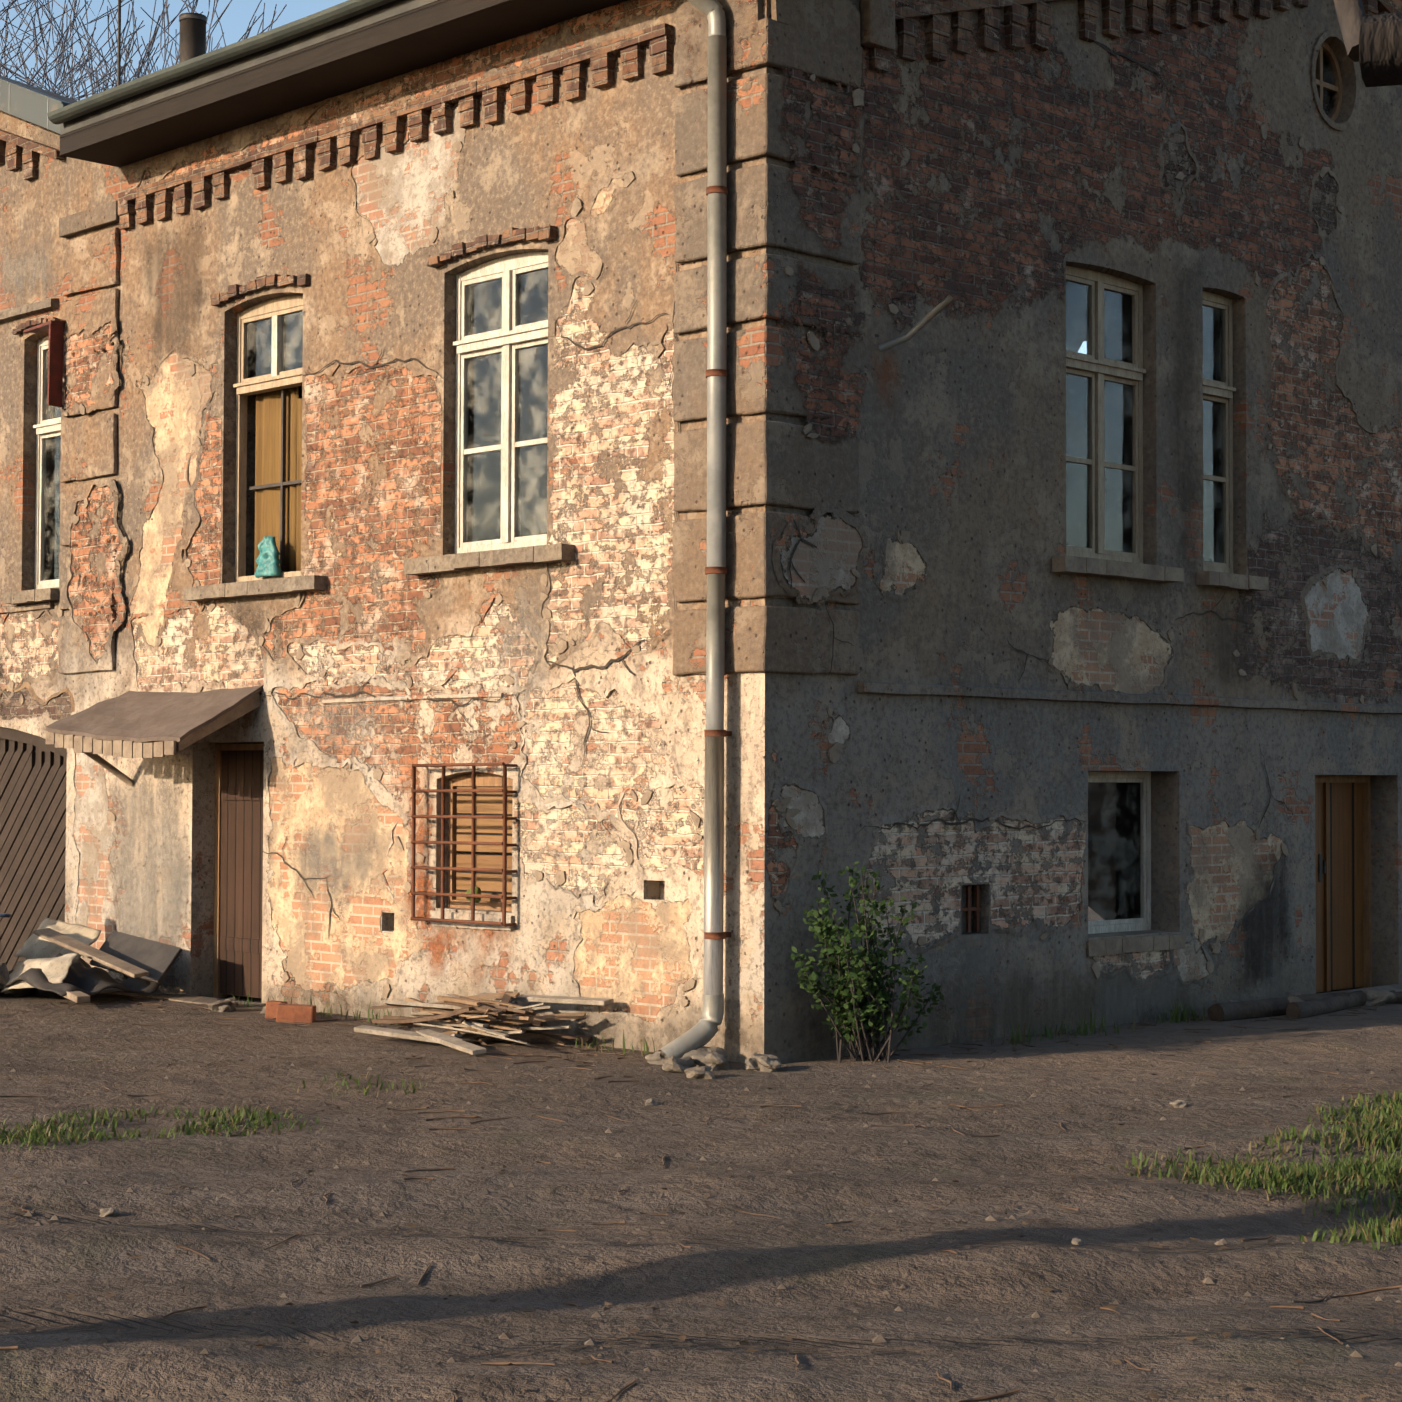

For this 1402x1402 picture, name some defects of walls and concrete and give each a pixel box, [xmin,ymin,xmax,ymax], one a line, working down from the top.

flaking render [772,0,1402,706]
flaking render [0,171,704,1031]
crack [546,639,645,766]
flaking render [816,704,852,764]
flaking render [767,750,828,915]
flaking render [852,803,1087,955]
flaking render [1090,812,1289,987]